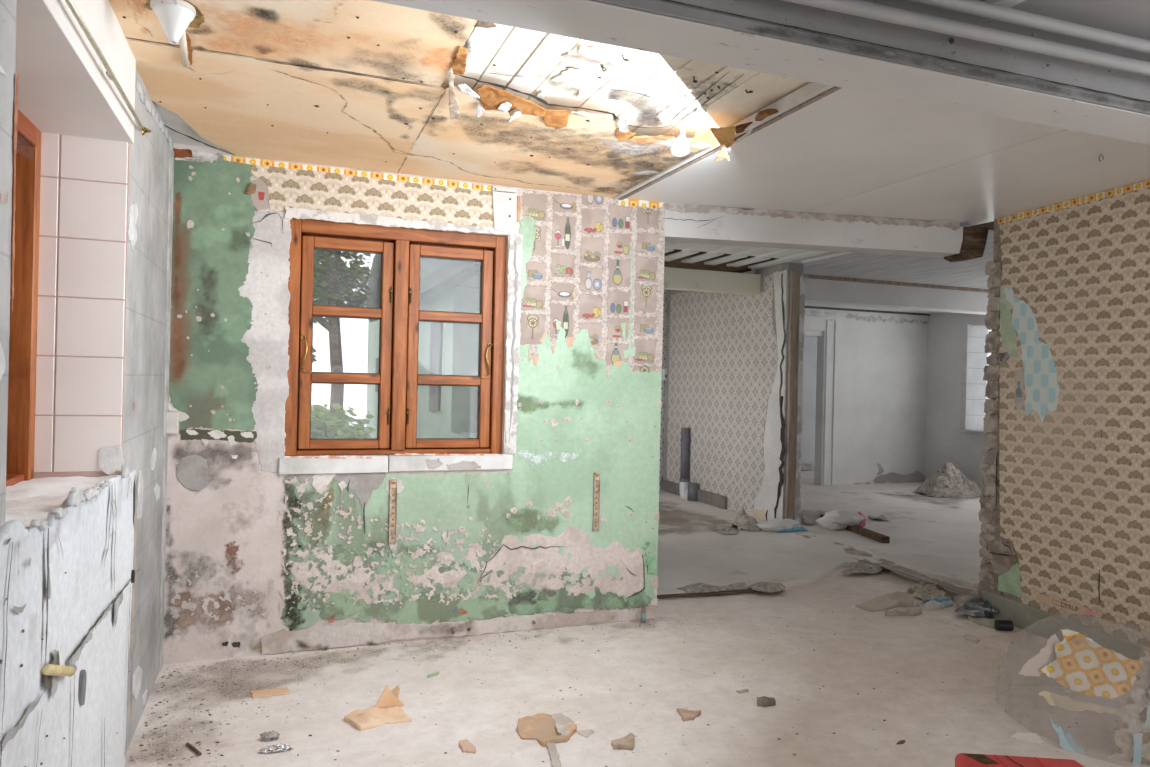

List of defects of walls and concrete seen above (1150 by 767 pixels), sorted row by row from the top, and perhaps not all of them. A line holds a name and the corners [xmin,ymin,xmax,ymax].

leakage [222,9,307,53]
crack [132,40,446,145]
mould [436,18,470,53]
leakage [340,77,693,196]
peeling [135,77,273,459]
spalling [29,445,139,594]
leakage [174,443,253,482]
peeling [168,243,662,648]
spalling [977,261,1023,600]
leakage [164,529,263,638]
crack [0,538,13,767]
crack [100,717,108,767]